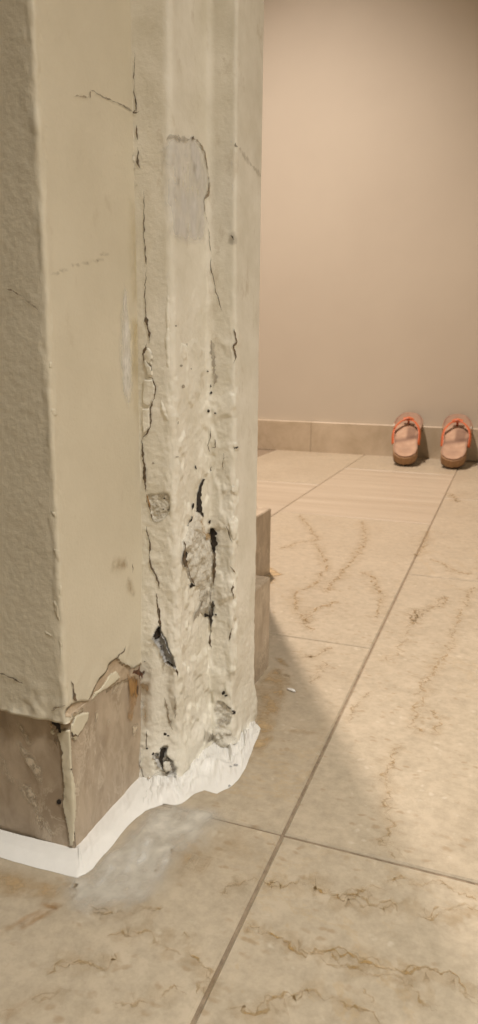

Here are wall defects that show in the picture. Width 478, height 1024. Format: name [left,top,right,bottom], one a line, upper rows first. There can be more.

crack [77,60,140,168]
crack [204,159,238,467]
crack [141,201,160,619]
flaking render [147,493,170,522]
flaking render [182,465,218,646]
flaking render [152,608,178,677]
peeling [51,646,137,733]
flaking render [146,731,177,778]
flaking render [208,691,237,748]